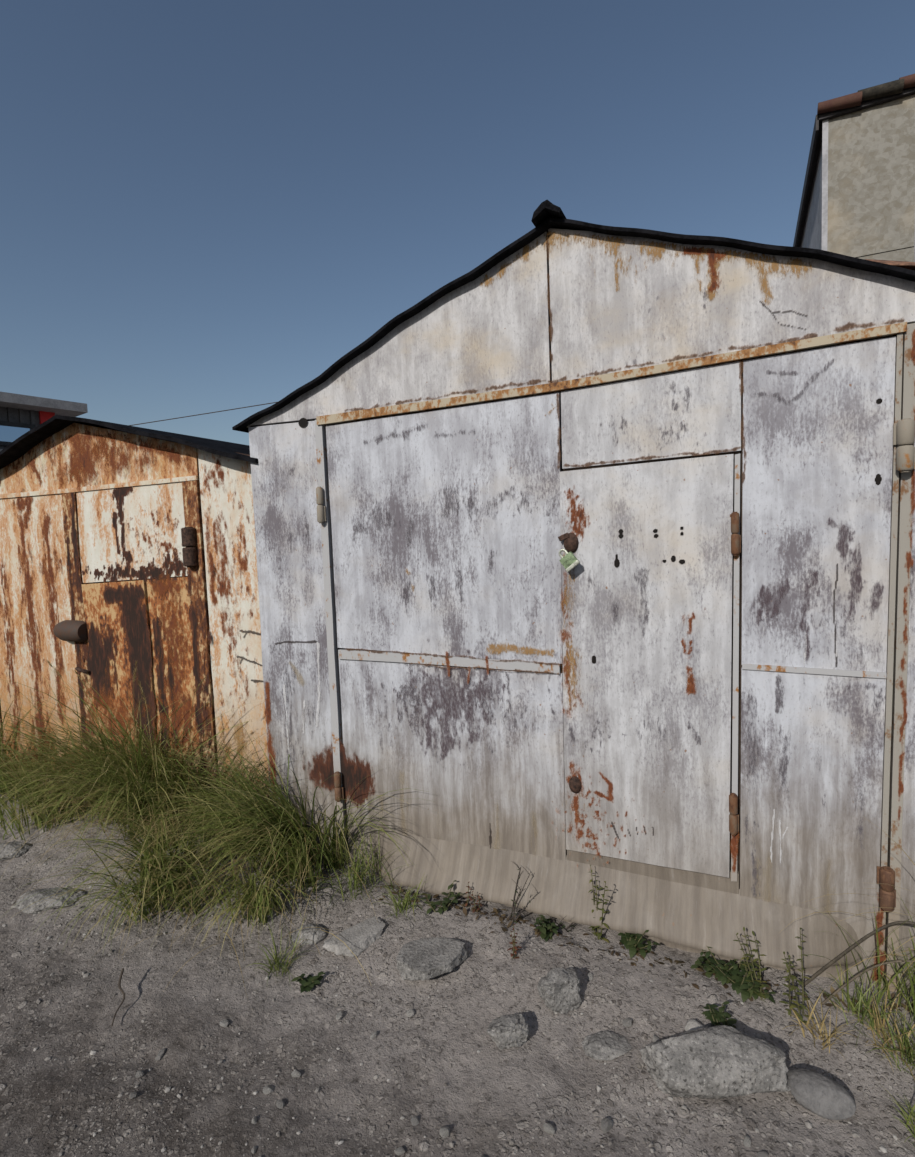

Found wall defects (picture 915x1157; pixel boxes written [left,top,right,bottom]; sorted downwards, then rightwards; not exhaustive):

corrosion [836,319,915,365]
corrosion [345,333,818,482]
corrosion [565,488,590,538]
corrosion [0,428,276,799]
peeling [381,663,526,759]
corrosion [681,613,696,695]
peeling [751,579,790,625]
peeling [795,570,821,660]
peeling [828,519,884,636]
corrosion [898,530,914,820]
corrosion [303,744,375,808]
corrosion [563,762,627,866]